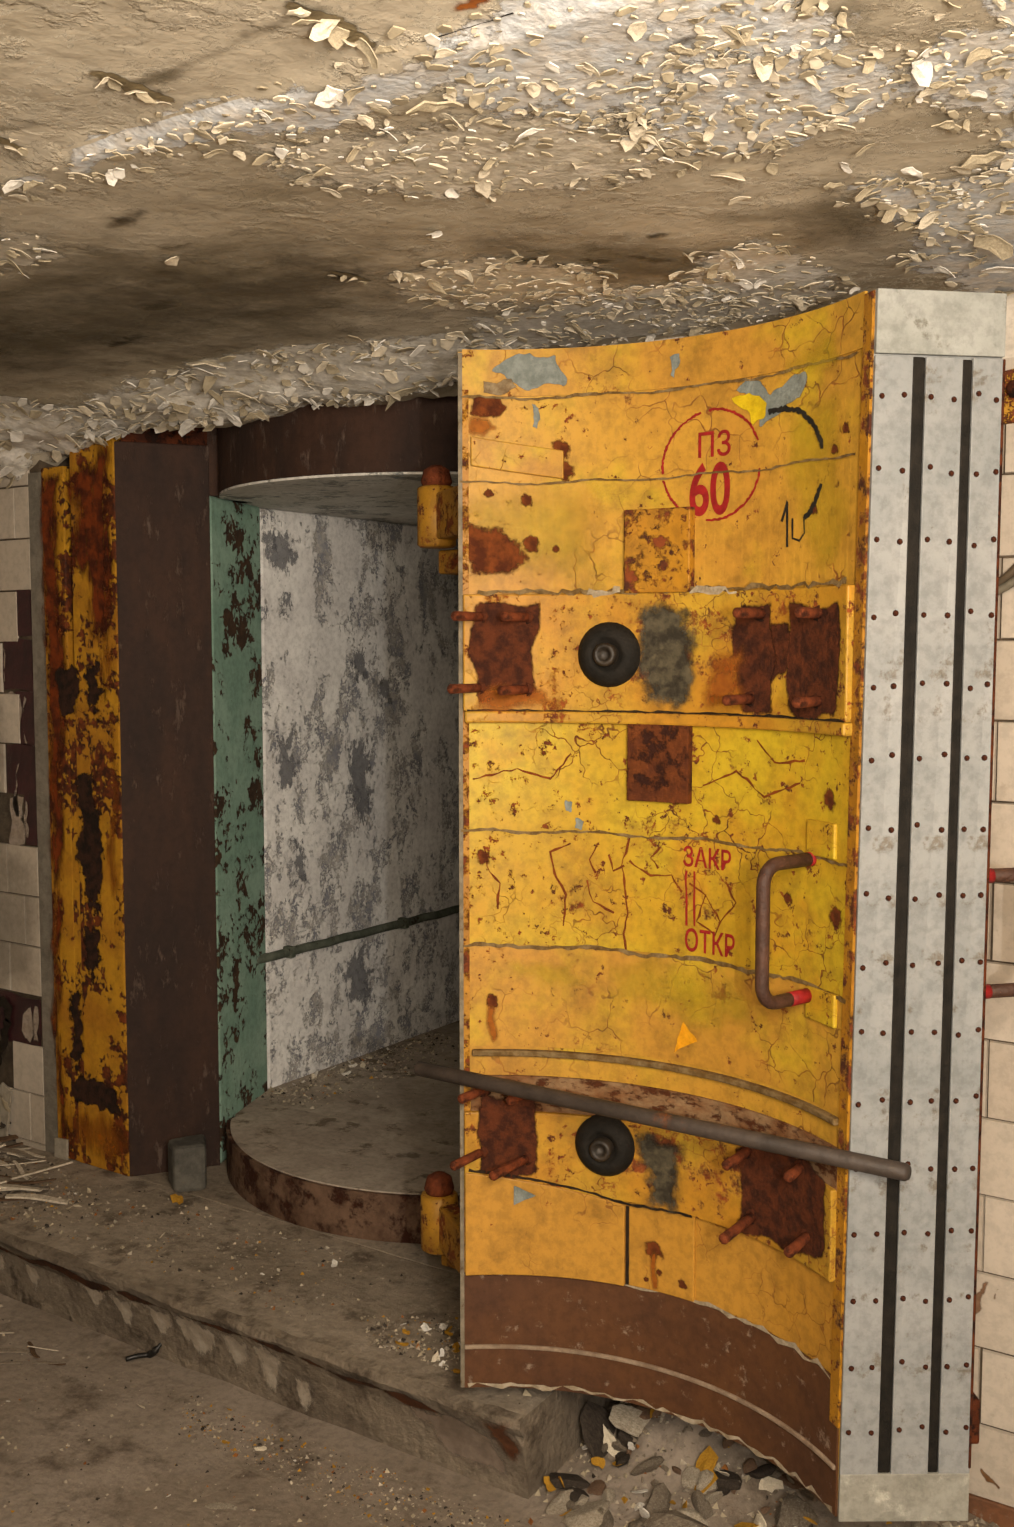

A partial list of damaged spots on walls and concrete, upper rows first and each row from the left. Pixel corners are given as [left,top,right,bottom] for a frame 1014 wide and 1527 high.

crack [422,12,514,42]
peeling [0,0,1014,296]
damp [0,259,341,355]
peeling [0,234,860,489]
rust [469,523,559,575]
peeling [3,590,38,846]
peeling [55,660,105,721]
rust [468,602,554,711]
rust [706,602,841,720]
peeling [0,989,42,1046]
rust [477,1095,538,1179]
rust [735,1147,826,1259]